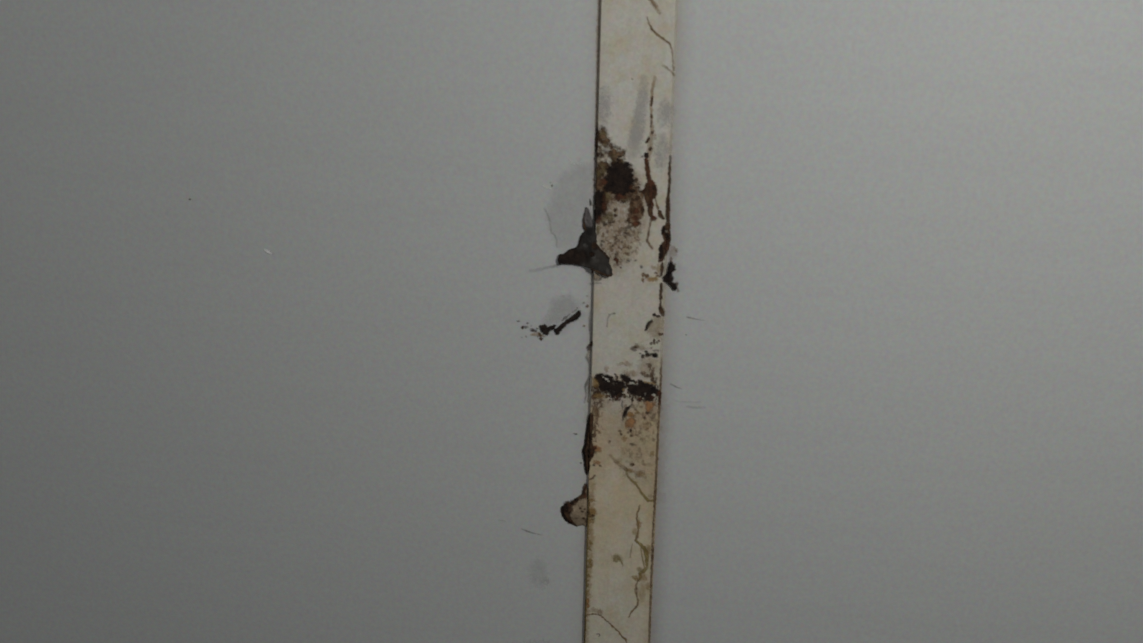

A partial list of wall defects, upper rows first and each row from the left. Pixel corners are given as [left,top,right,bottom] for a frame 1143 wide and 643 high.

peeling [558,207,613,280]
crack [589,455,654,642]